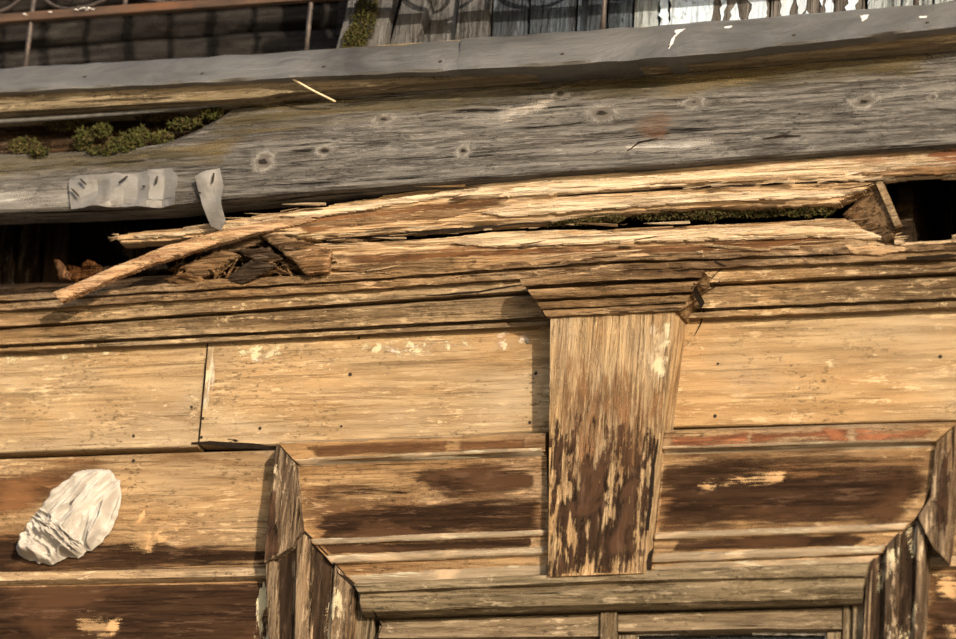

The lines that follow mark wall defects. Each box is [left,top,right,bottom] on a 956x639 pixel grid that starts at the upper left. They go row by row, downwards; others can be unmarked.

peeling [659,0,768,25]
peeling [780,0,809,16]
peeling [820,0,870,12]
crack [557,179,892,196]
crack [321,222,553,244]
crack [661,261,726,336]
water stain [311,369,925,639]
water stain [934,448,951,535]
water stain [0,491,294,639]
water stain [927,573,956,639]